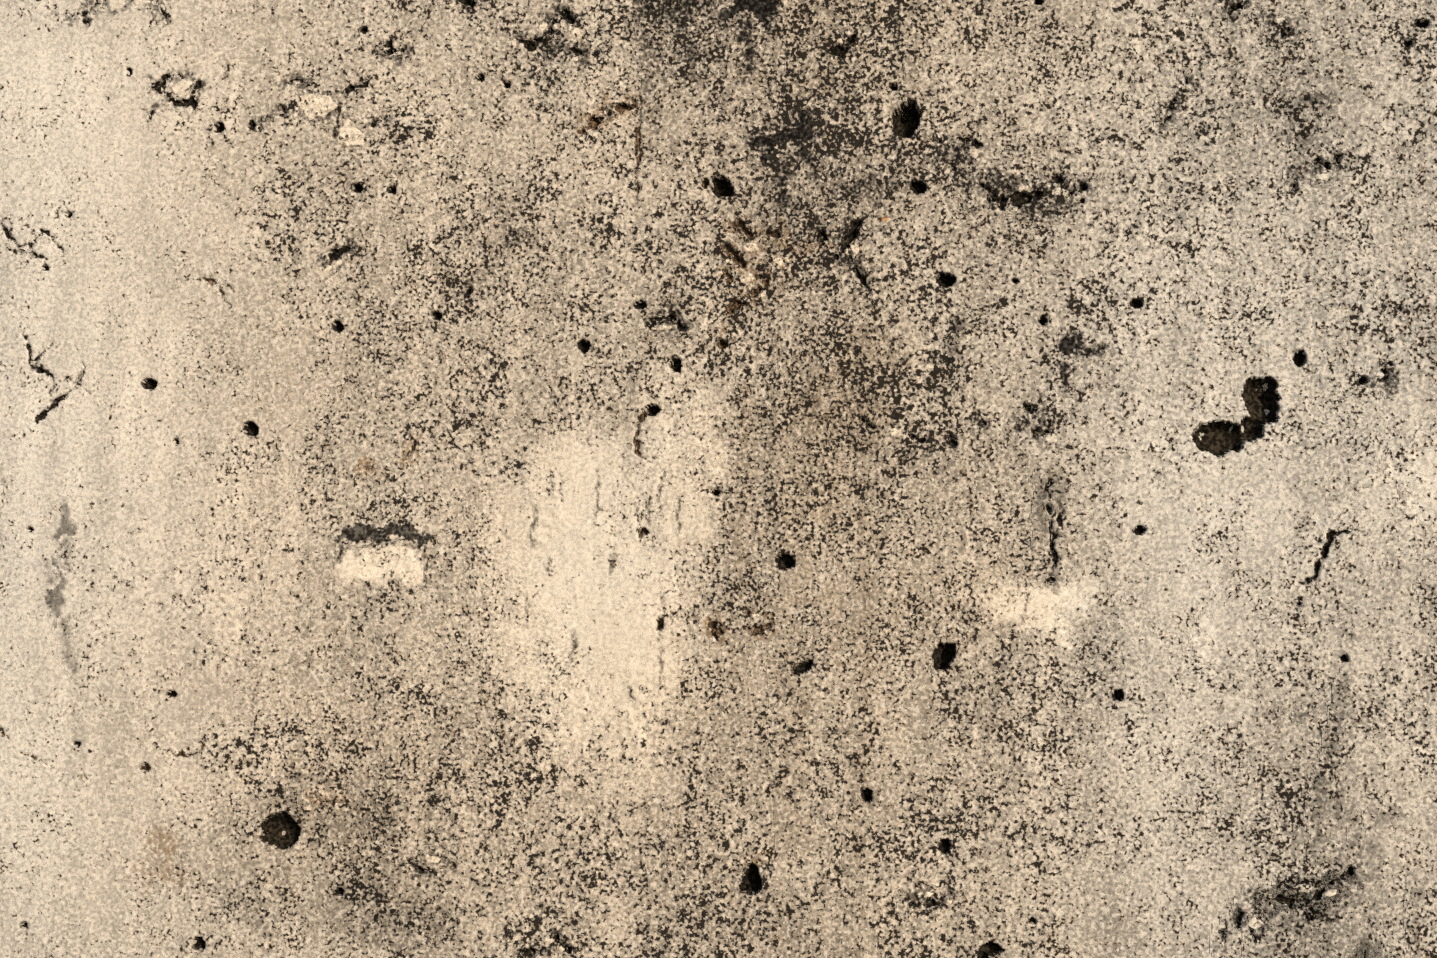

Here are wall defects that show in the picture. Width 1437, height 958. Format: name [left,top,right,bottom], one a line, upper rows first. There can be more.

crack [0,216,66,265]
crack [20,331,91,439]
crack [1296,524,1363,610]